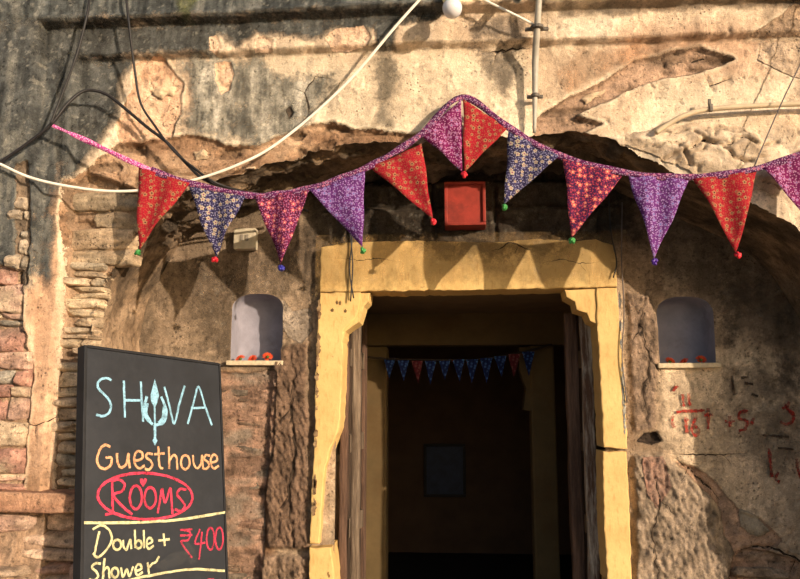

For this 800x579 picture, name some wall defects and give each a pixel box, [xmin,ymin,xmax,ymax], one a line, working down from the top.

damp [0,0,444,282]
damp [472,18,524,42]
damp [479,51,517,93]
spalling [532,47,734,136]
spalling [51,54,426,489]
crack [632,297,659,424]
crack [280,376,297,543]
spalling [637,431,661,445]
spalling [643,456,672,508]
spalling [676,461,800,579]